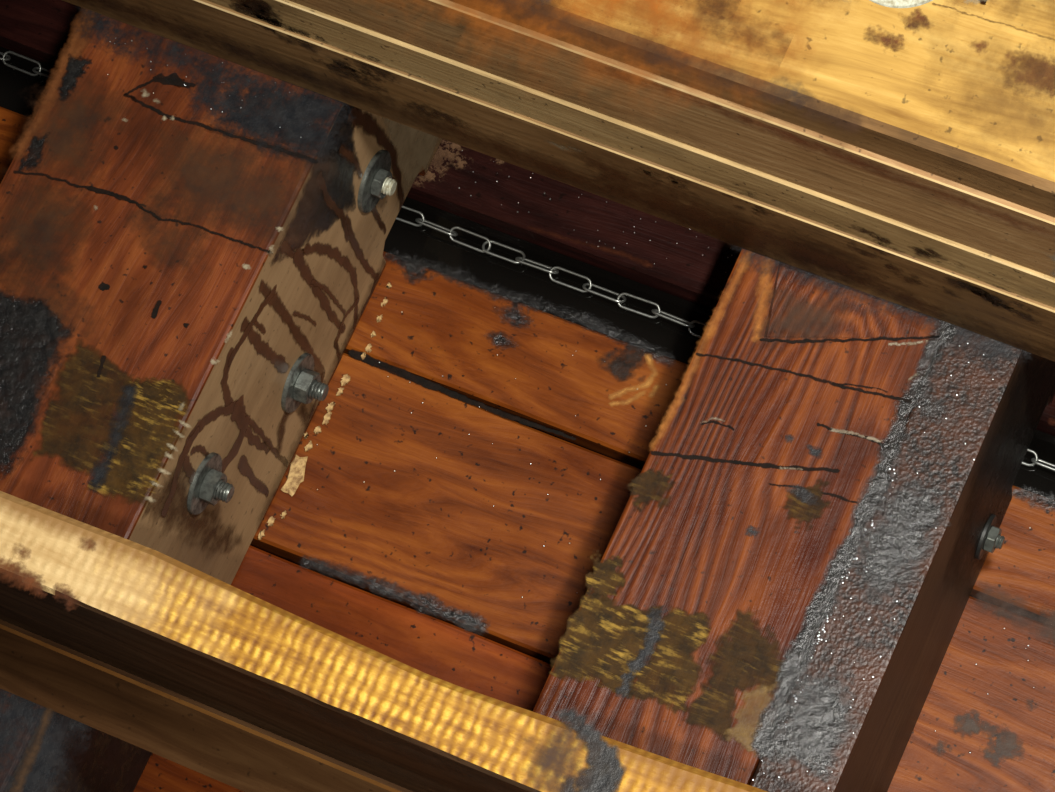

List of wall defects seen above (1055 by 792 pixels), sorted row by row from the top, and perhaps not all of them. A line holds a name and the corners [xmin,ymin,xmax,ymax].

damp [17,0,394,154]
crack [124,73,318,163]
crack [14,171,273,254]
damp [401,104,865,339]
crack [696,336,940,403]
crack [701,420,734,430]
crack [817,423,883,447]
crack [651,451,858,503]